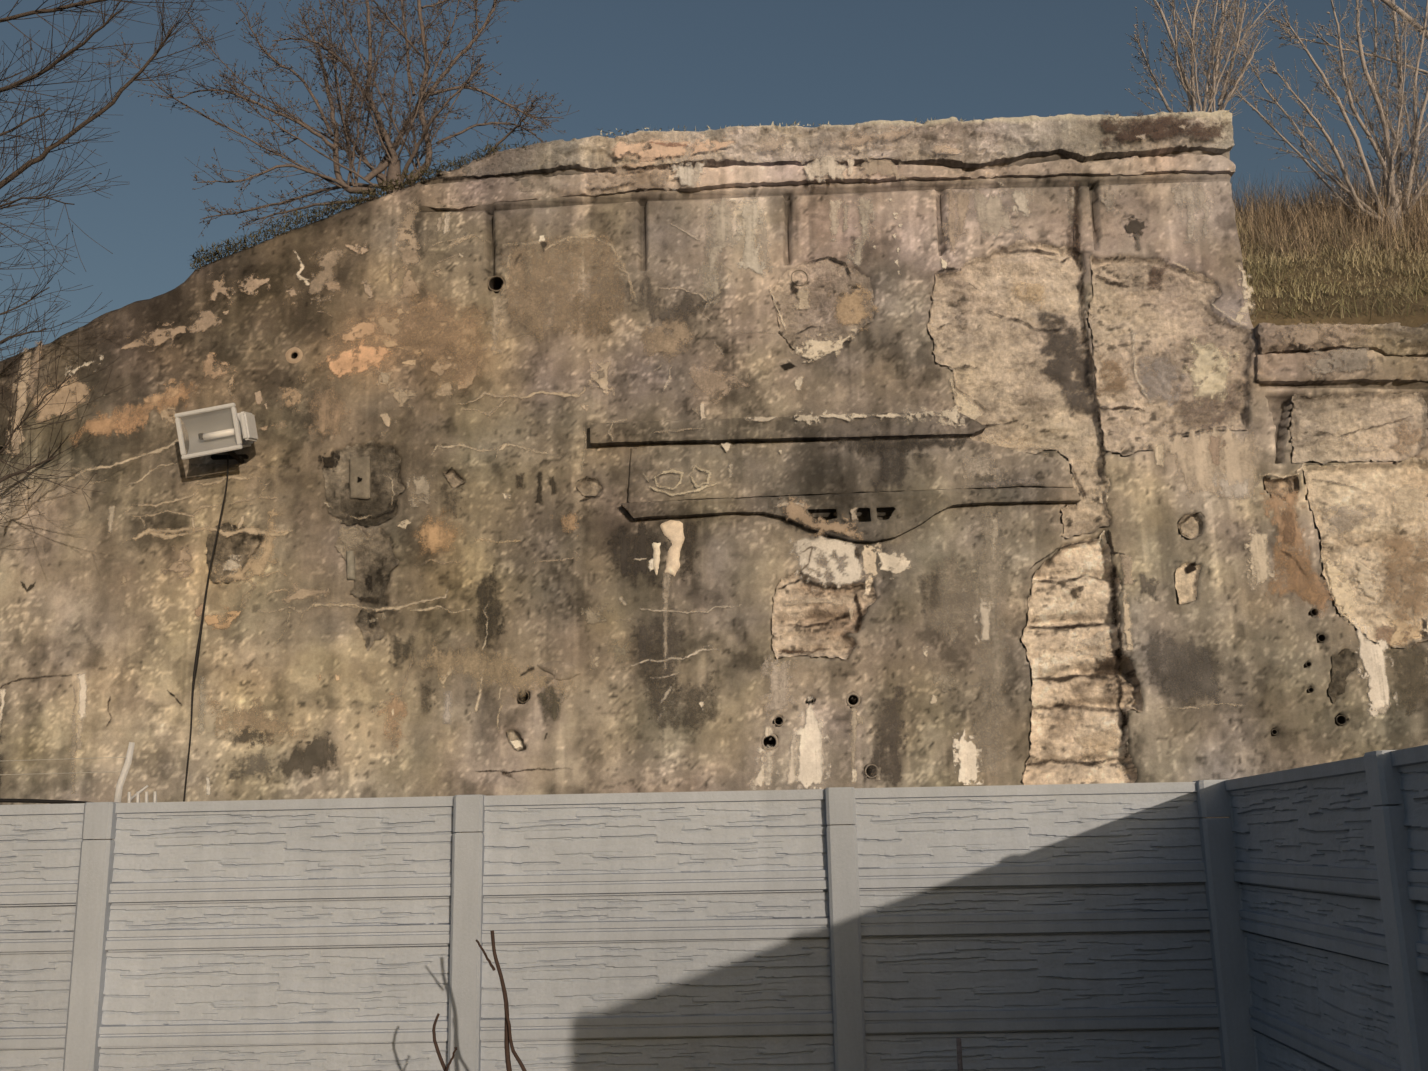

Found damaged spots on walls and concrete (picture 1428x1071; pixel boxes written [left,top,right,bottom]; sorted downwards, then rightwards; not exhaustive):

peeling [121,275,270,352]
spalling [770,256,877,390]
crack [1048,185,1106,466]
spalling [162,508,329,629]
peeling [255,204,484,651]
water stain [393,571,565,723]
water stain [516,472,556,503]
water stain [607,520,717,730]
spalling [771,497,910,660]
spalling [794,177,1255,785]
crack [1030,530,1125,569]
spalling [1263,391,1428,648]